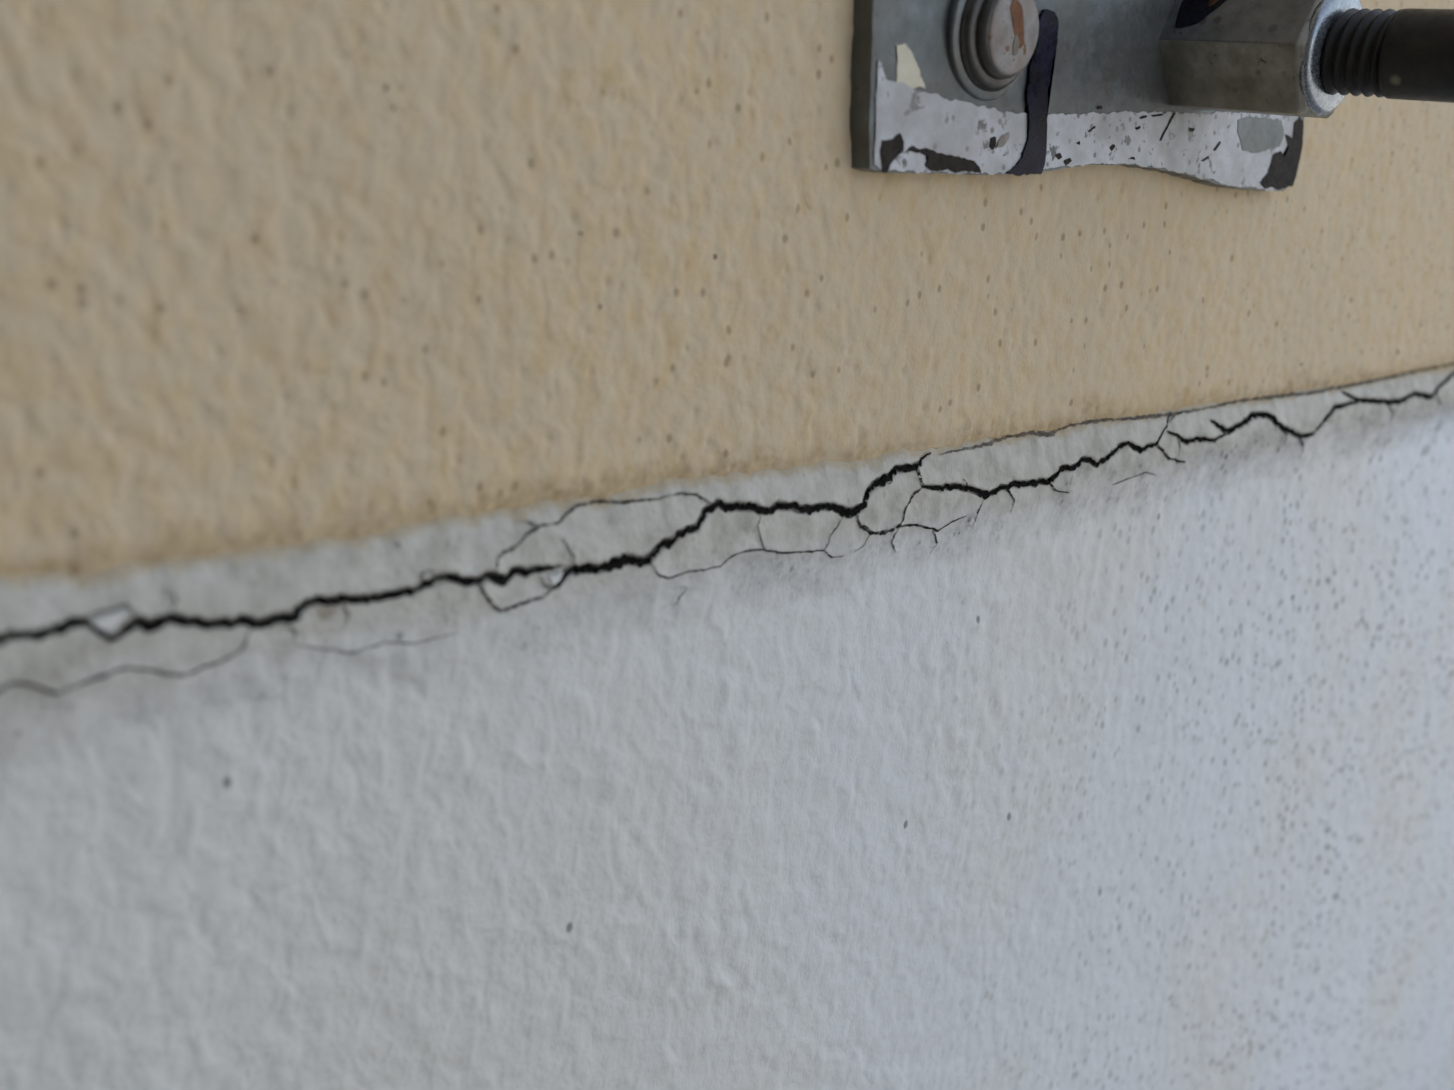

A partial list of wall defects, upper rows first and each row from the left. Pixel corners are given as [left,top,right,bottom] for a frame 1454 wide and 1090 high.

crack [0,363,1454,695]